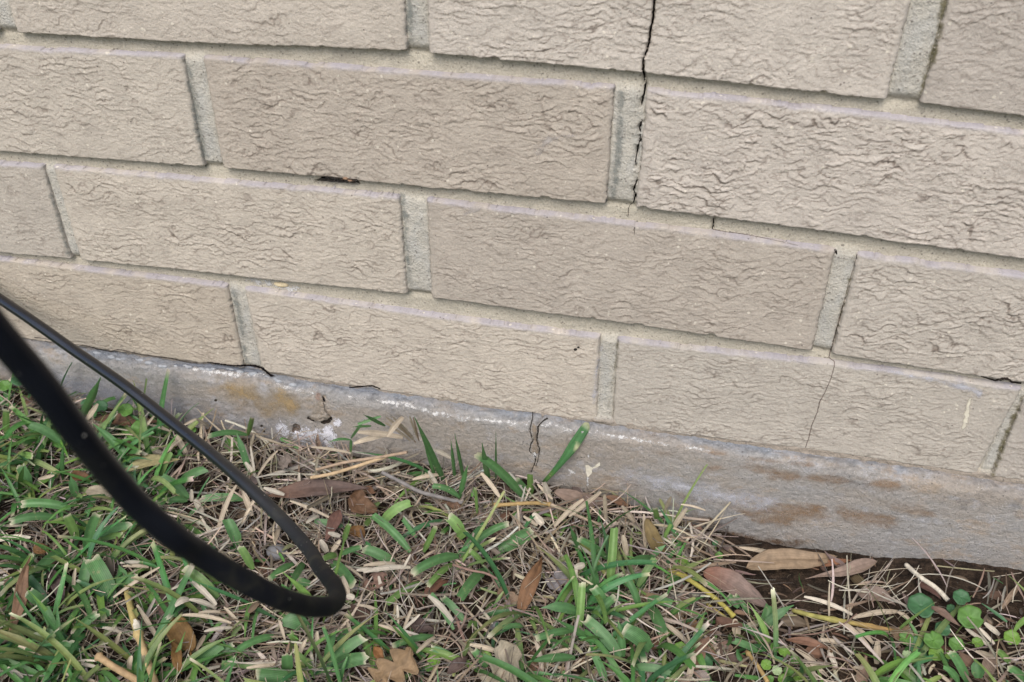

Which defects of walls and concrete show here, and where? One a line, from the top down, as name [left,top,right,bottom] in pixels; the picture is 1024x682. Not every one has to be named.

crack [628,0,655,234]
crack [712,218,795,245]
crack [529,412,548,472]
crack [805,249,857,448]